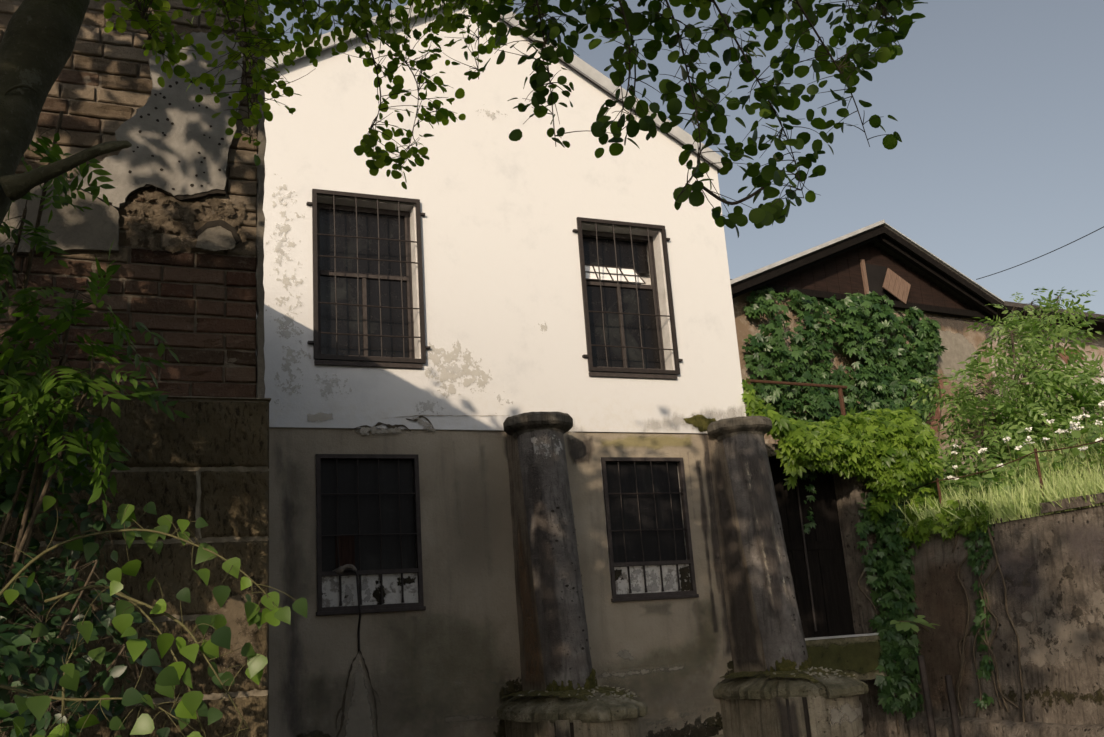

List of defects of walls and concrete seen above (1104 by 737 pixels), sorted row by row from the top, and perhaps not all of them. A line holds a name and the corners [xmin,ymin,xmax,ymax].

spalling [124,184,250,254]
peeling [266,174,311,403]
peeling [350,340,513,435]